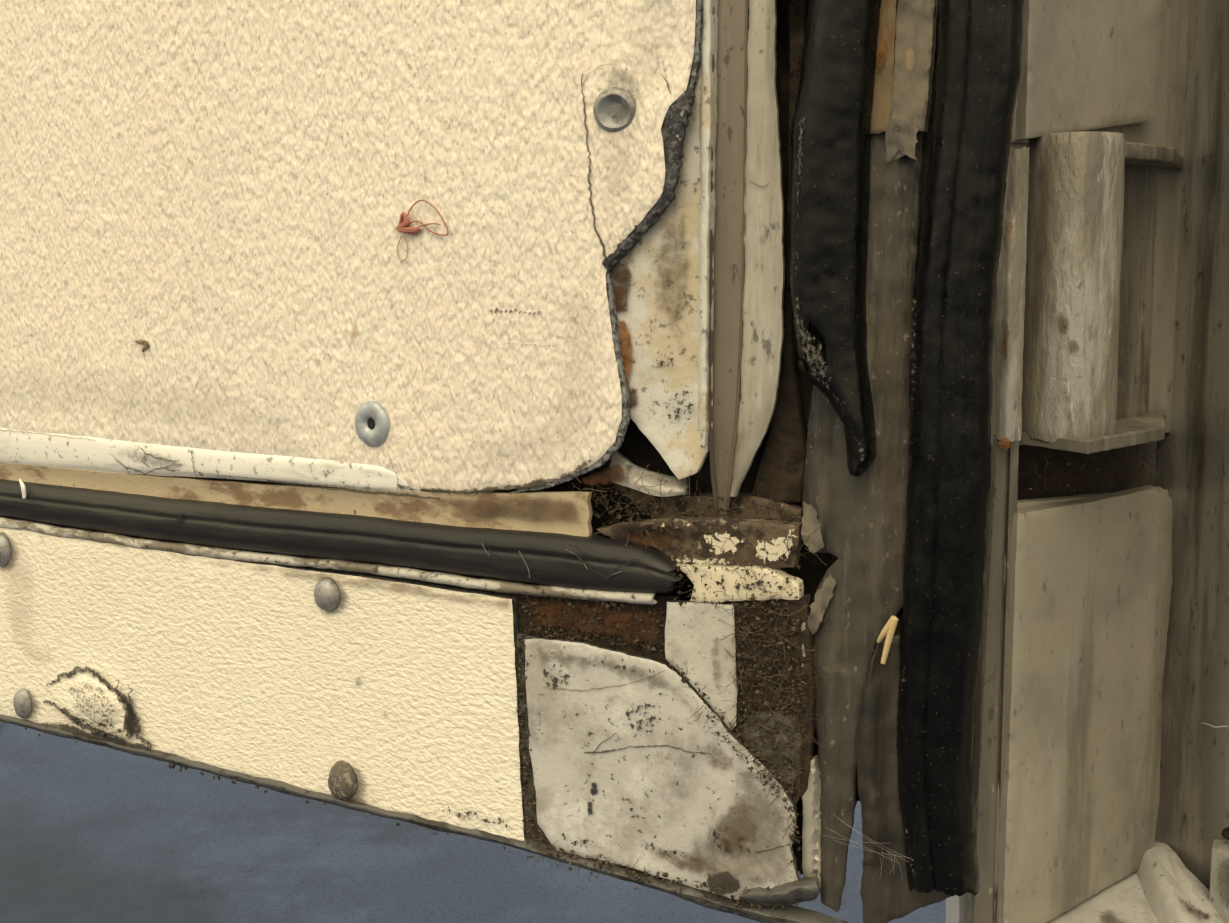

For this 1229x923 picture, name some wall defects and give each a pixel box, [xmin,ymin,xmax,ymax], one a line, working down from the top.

crack [581,73,608,261]
corrosion [610,264,637,408]
water stain [665,388,694,425]
peeling [672,529,798,567]
water stain [1101,913,1121,923]